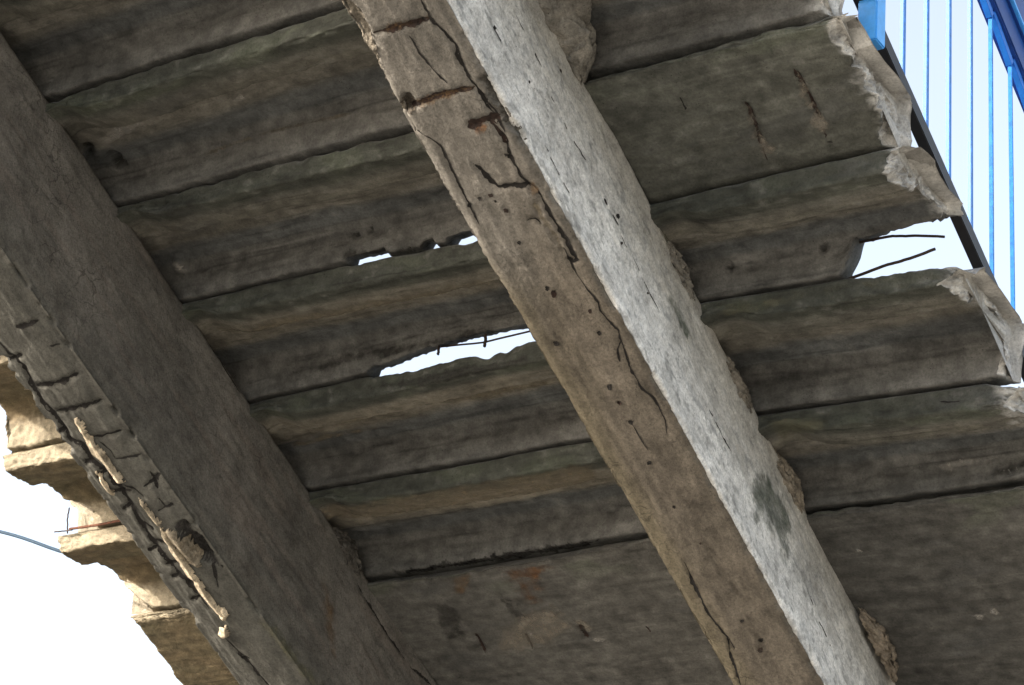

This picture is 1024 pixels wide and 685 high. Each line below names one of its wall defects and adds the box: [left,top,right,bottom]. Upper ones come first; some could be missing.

crack [373,0,667,453]
spalling [74,417,126,496]
crack [0,320,219,609]
spalling [139,499,230,639]
leakage [753,475,791,536]